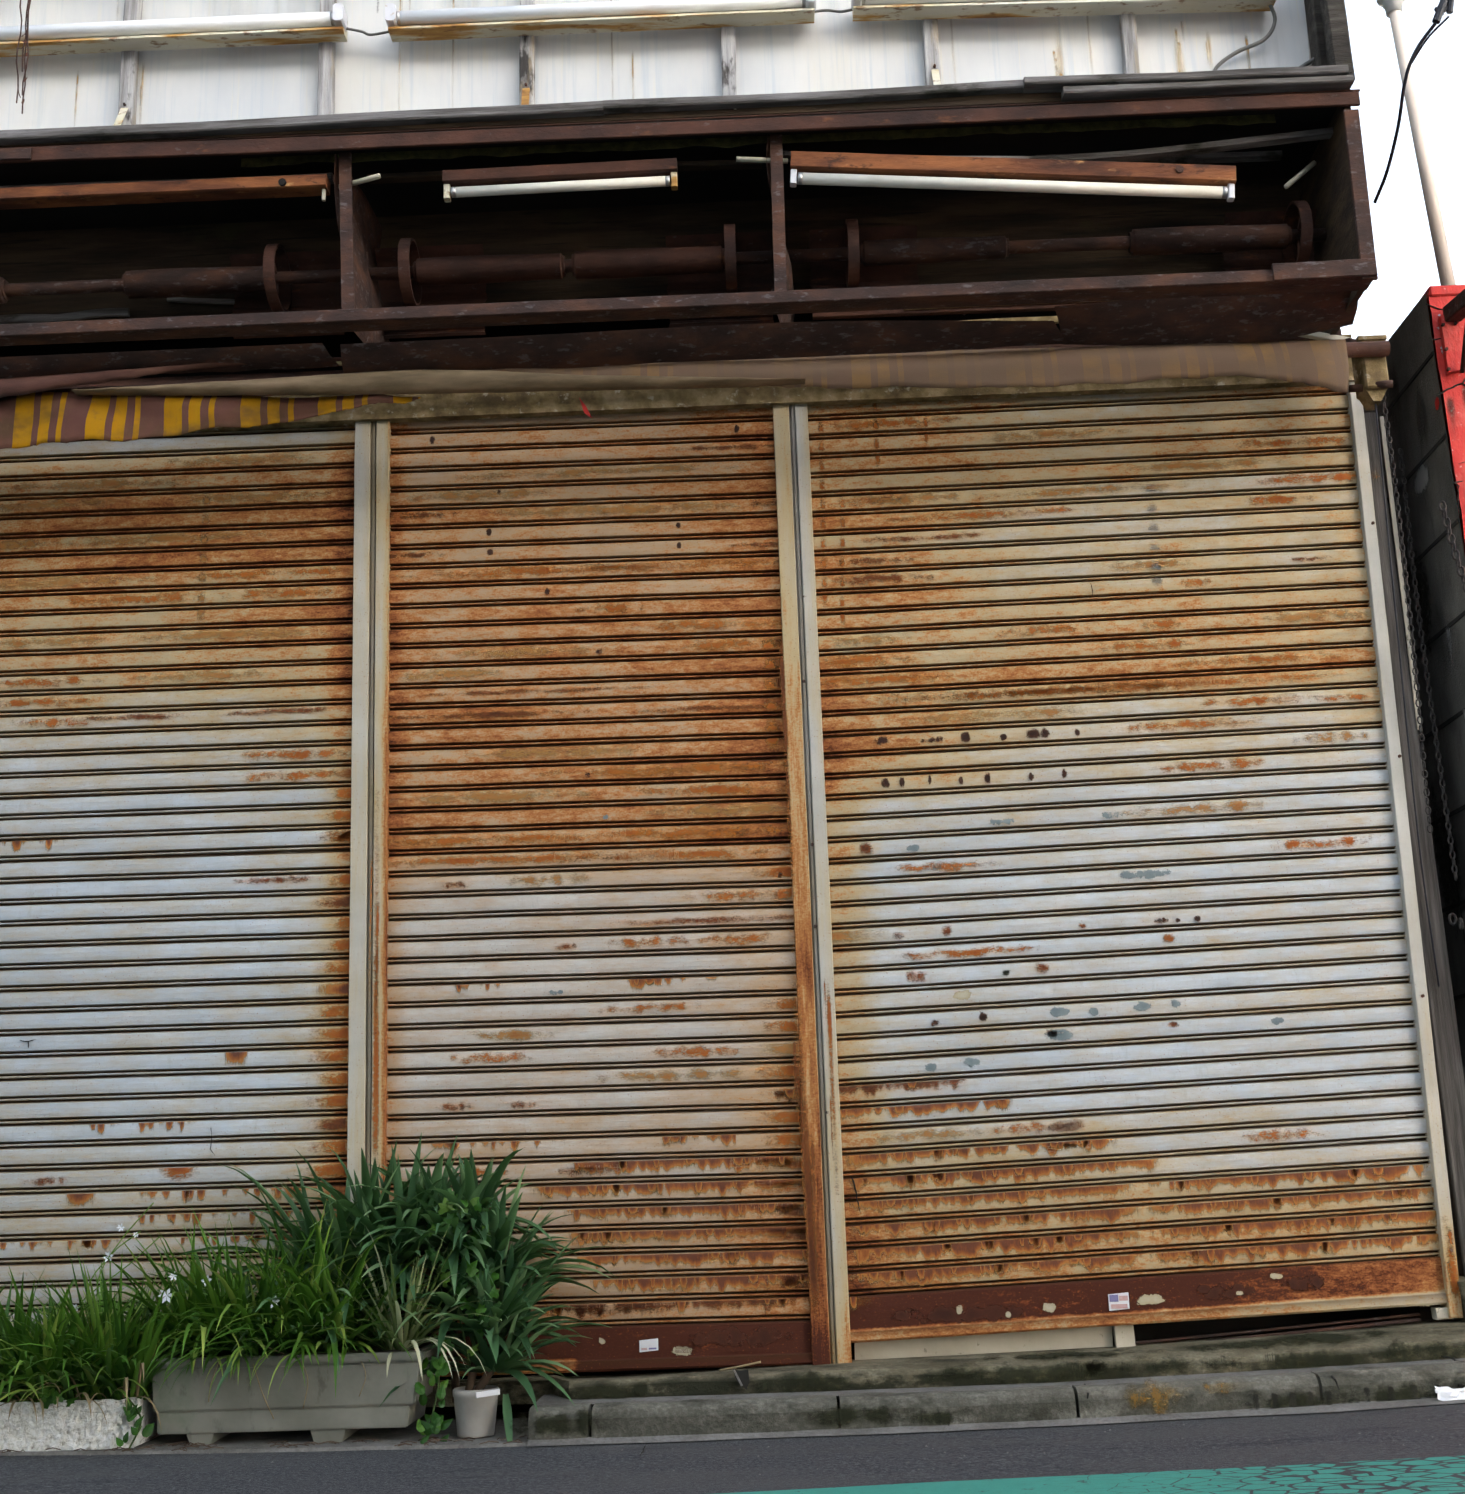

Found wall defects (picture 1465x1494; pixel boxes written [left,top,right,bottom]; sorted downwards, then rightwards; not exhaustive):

rust [400,444,777,519]
rust [0,492,340,641]
rust [2,675,170,727]
rust [244,748,351,841]
rust [369,619,794,1154]
rust [899,862,976,872]
rust [1284,836,1367,850]
rust [893,926,1048,982]
rust [138,874,350,1246]
rust [532,984,819,1320]
rust [824,981,1460,1309]
rust [0,1239,119,1250]